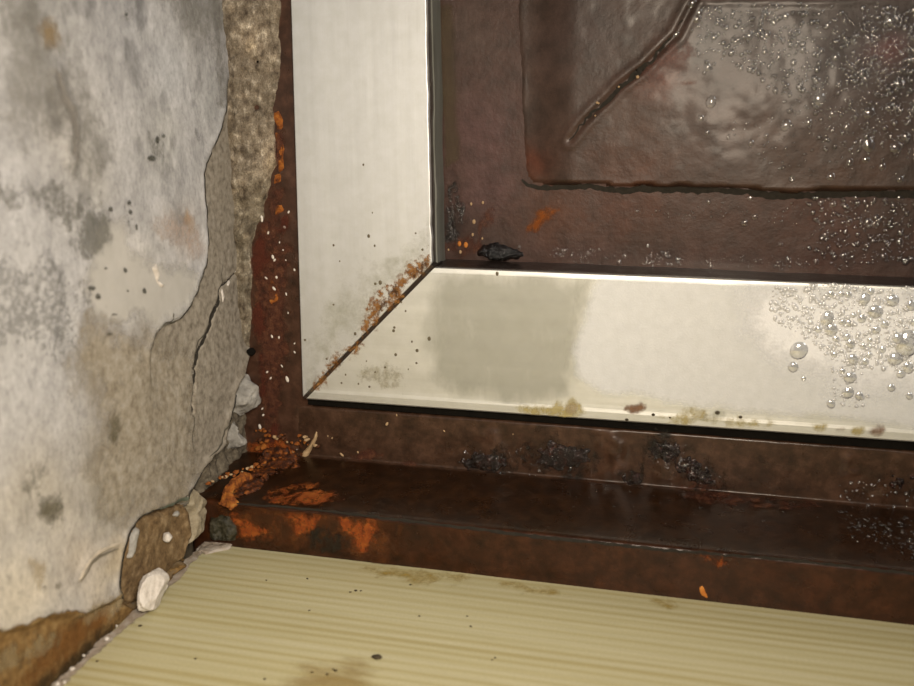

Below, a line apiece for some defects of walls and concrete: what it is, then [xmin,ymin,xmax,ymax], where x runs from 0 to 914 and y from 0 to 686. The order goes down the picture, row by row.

leakage [0,594,137,686]
spalling [79,504,192,604]
spalling [86,92,250,474]
crack [119,266,250,599]
corrosion [205,111,400,564]
corrosion [313,248,430,391]